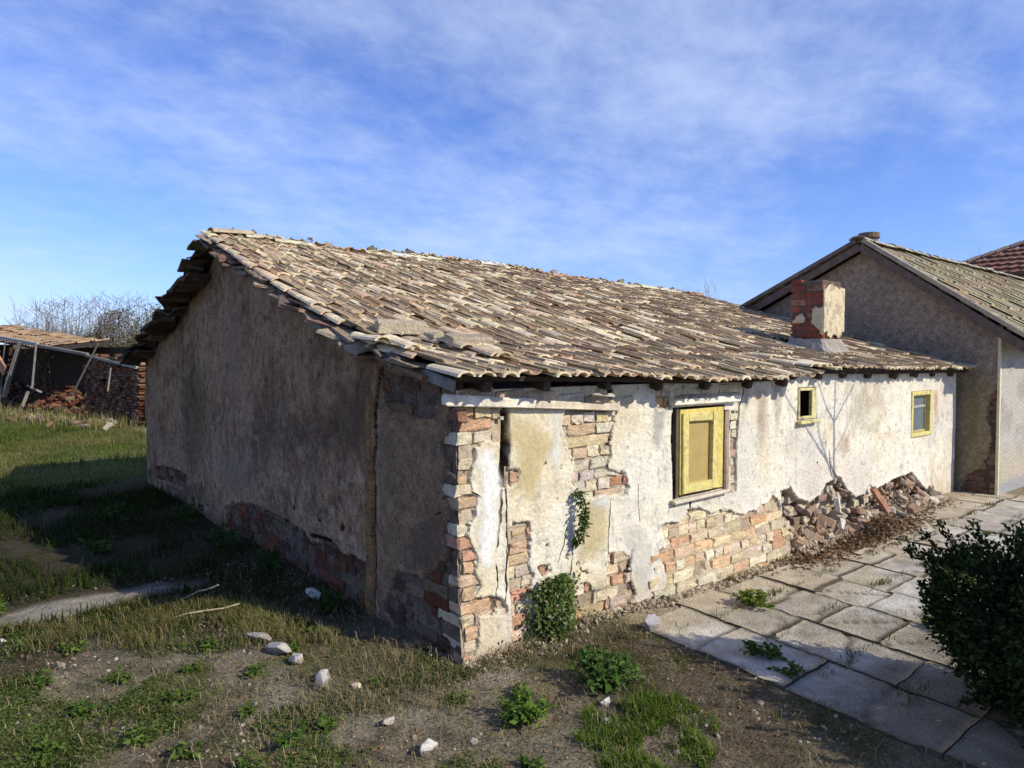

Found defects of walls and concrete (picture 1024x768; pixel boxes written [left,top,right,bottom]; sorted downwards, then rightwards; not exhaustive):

flaking render [225,369,551,664]
crack [471,424,508,608]
flaking render [561,410,626,498]
flaking render [565,550,634,620]
flaking render [648,474,945,600]
flaking render [961,394,997,495]